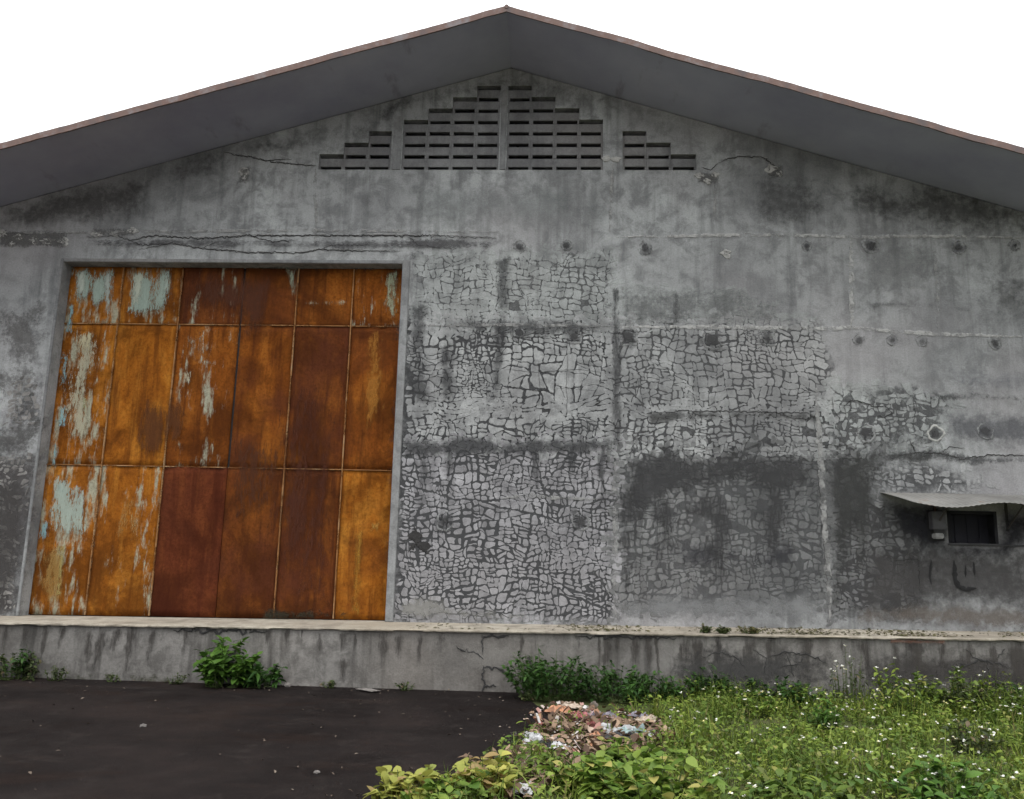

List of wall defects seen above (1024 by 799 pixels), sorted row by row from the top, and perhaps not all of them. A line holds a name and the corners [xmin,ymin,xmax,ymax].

crack [88,233,496,254]
peeling [128,270,169,315]
peeling [59,266,115,441]
rust [367,334,381,419]
rust [138,401,184,452]
crack [658,400,1024,460]
peeling [39,477,86,595]
water stain [618,449,808,570]
water stain [834,454,879,544]
rust [265,609,328,619]
water stain [85,629,133,670]
crack [456,634,508,692]